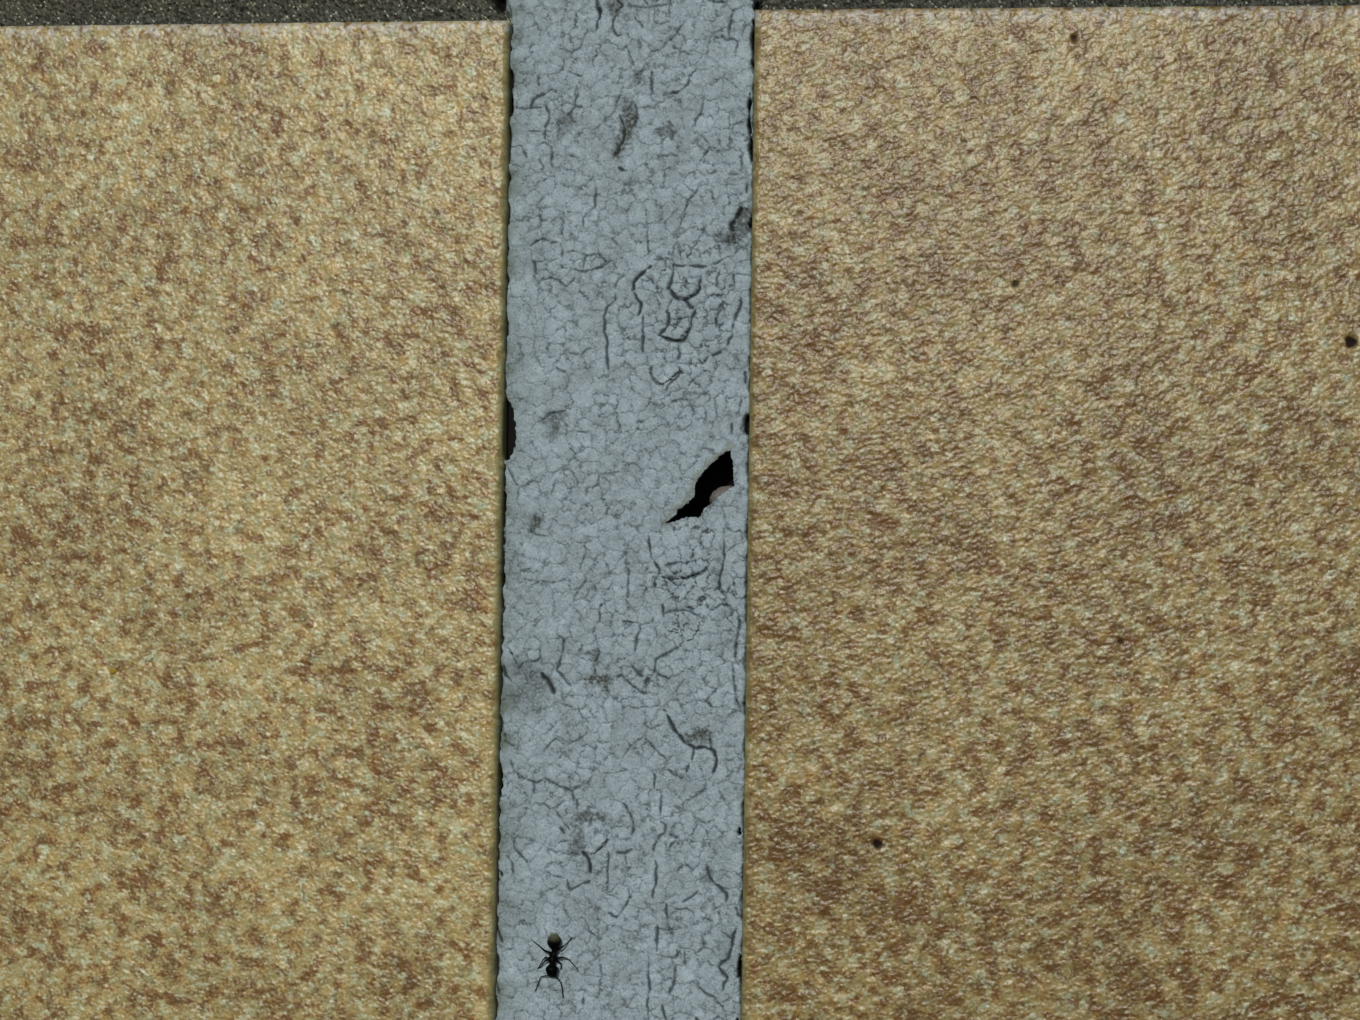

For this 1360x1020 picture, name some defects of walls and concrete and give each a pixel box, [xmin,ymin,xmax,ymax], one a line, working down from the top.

crack [730,186,748,231]
crack [633,266,700,345]
crack [541,673,555,693]
crack [668,716,717,773]
crack [707,867,740,986]